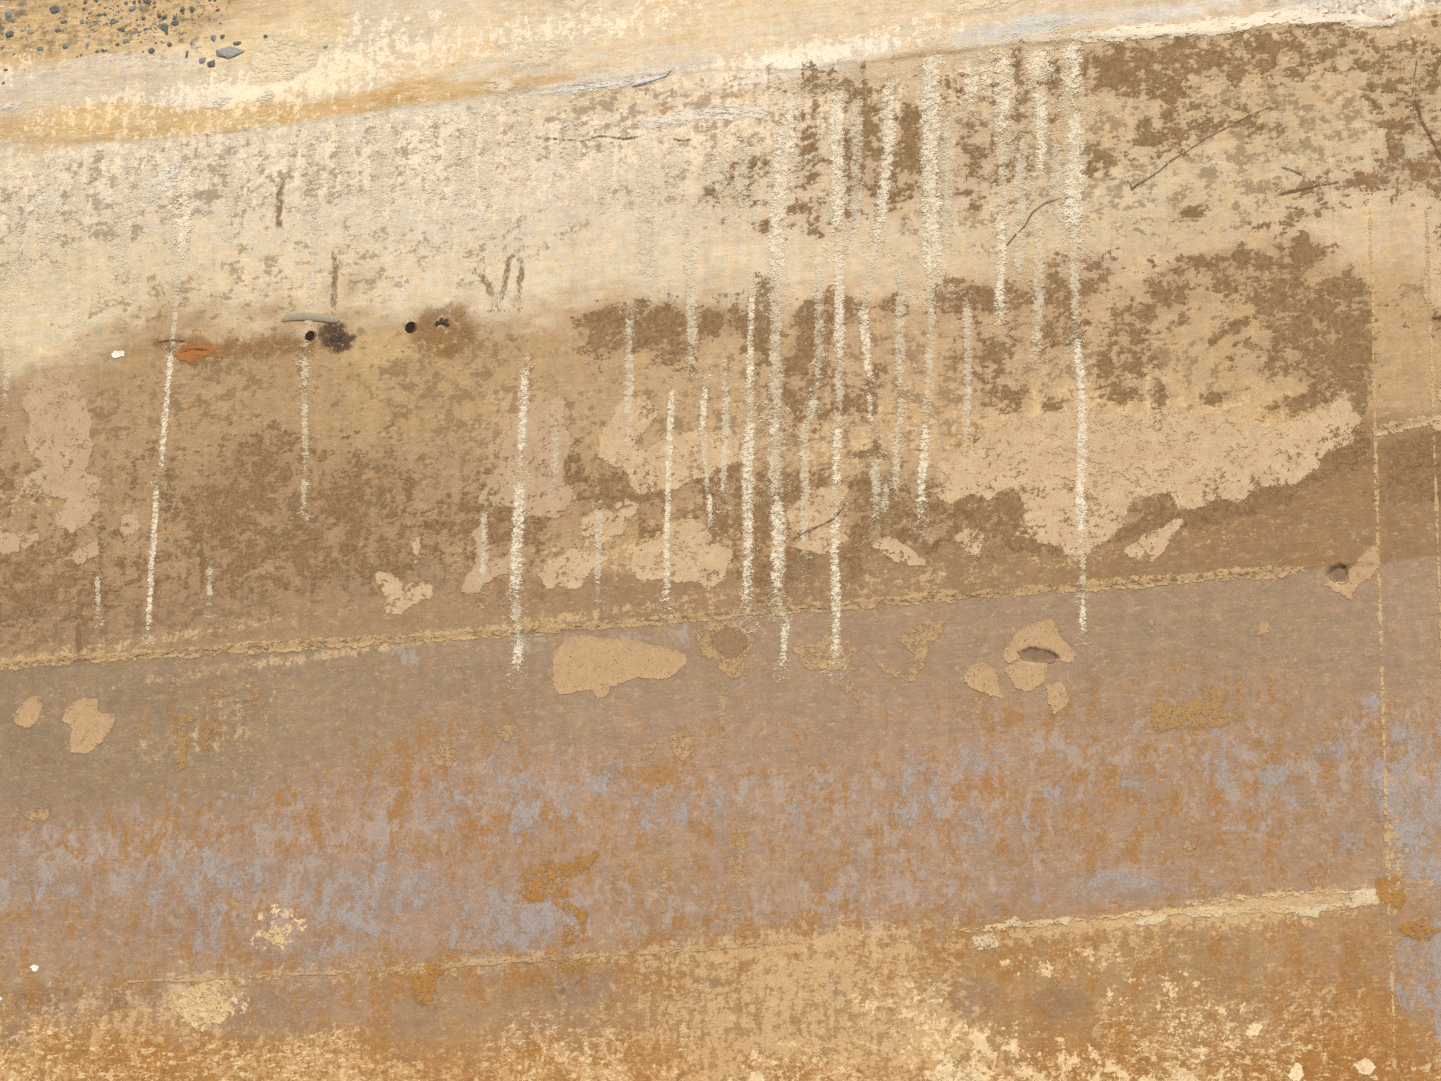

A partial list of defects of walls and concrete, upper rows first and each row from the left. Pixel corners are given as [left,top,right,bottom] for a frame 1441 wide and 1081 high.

leakage [97,139,245,645]
leakage [274,68,675,520]
leakage [620,8,1398,683]
leakage [479,357,563,681]
peeling [930,381,1441,562]
peeling [375,571,433,615]
spalling [552,621,756,699]
spalling [964,619,1076,714]
rust [1143,687,1242,731]
rust [517,854,597,971]
rust [1375,875,1441,938]
peeling [1289,1062,1304,1081]